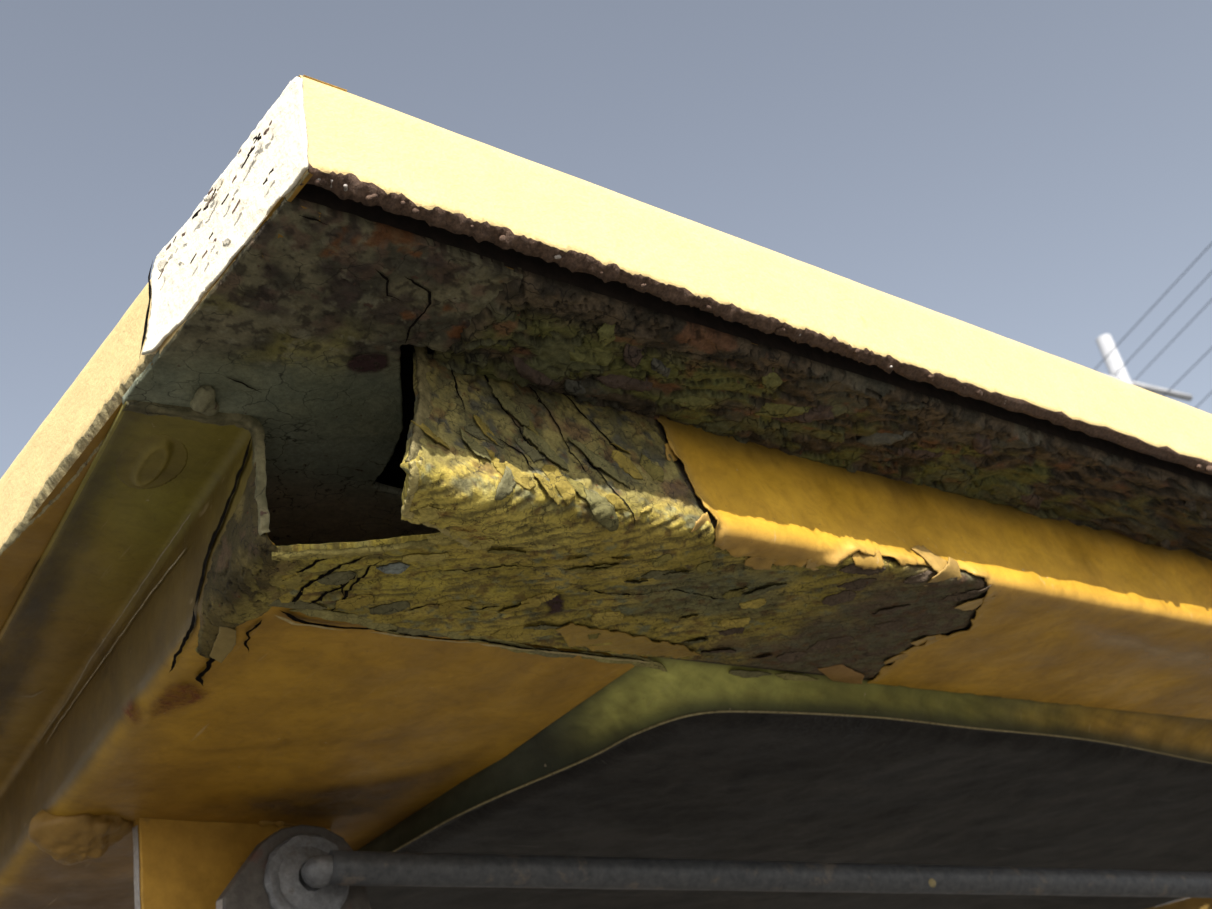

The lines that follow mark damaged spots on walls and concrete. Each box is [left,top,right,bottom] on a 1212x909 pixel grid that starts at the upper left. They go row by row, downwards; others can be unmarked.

crack [139,261,153,358]
crack [376,270,431,343]
crack [169,437,262,686]
peeling [851,550,884,570]
peeling [910,545,962,586]
peeling [954,596,995,611]
peeling [275,610,701,663]
peeling [817,664,865,684]